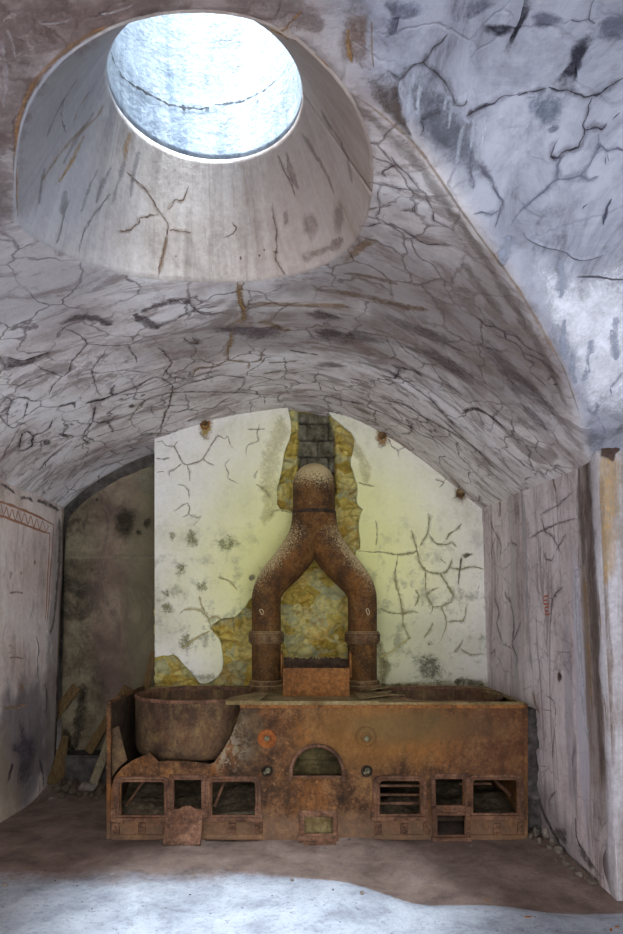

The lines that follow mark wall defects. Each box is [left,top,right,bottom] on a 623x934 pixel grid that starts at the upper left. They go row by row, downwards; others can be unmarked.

crack [387,34,623,229]
crack [117,173,190,269]
crack [368,157,444,246]
crack [1,395,60,470]
leakage [115,509,150,535]
crack [36,281,297,525]
flaking render [277,410,362,555]
crack [312,365,504,466]
crack [181,596,221,648]
flaking render [154,598,252,686]
flaking render [281,559,348,667]
crack [364,494,576,667]